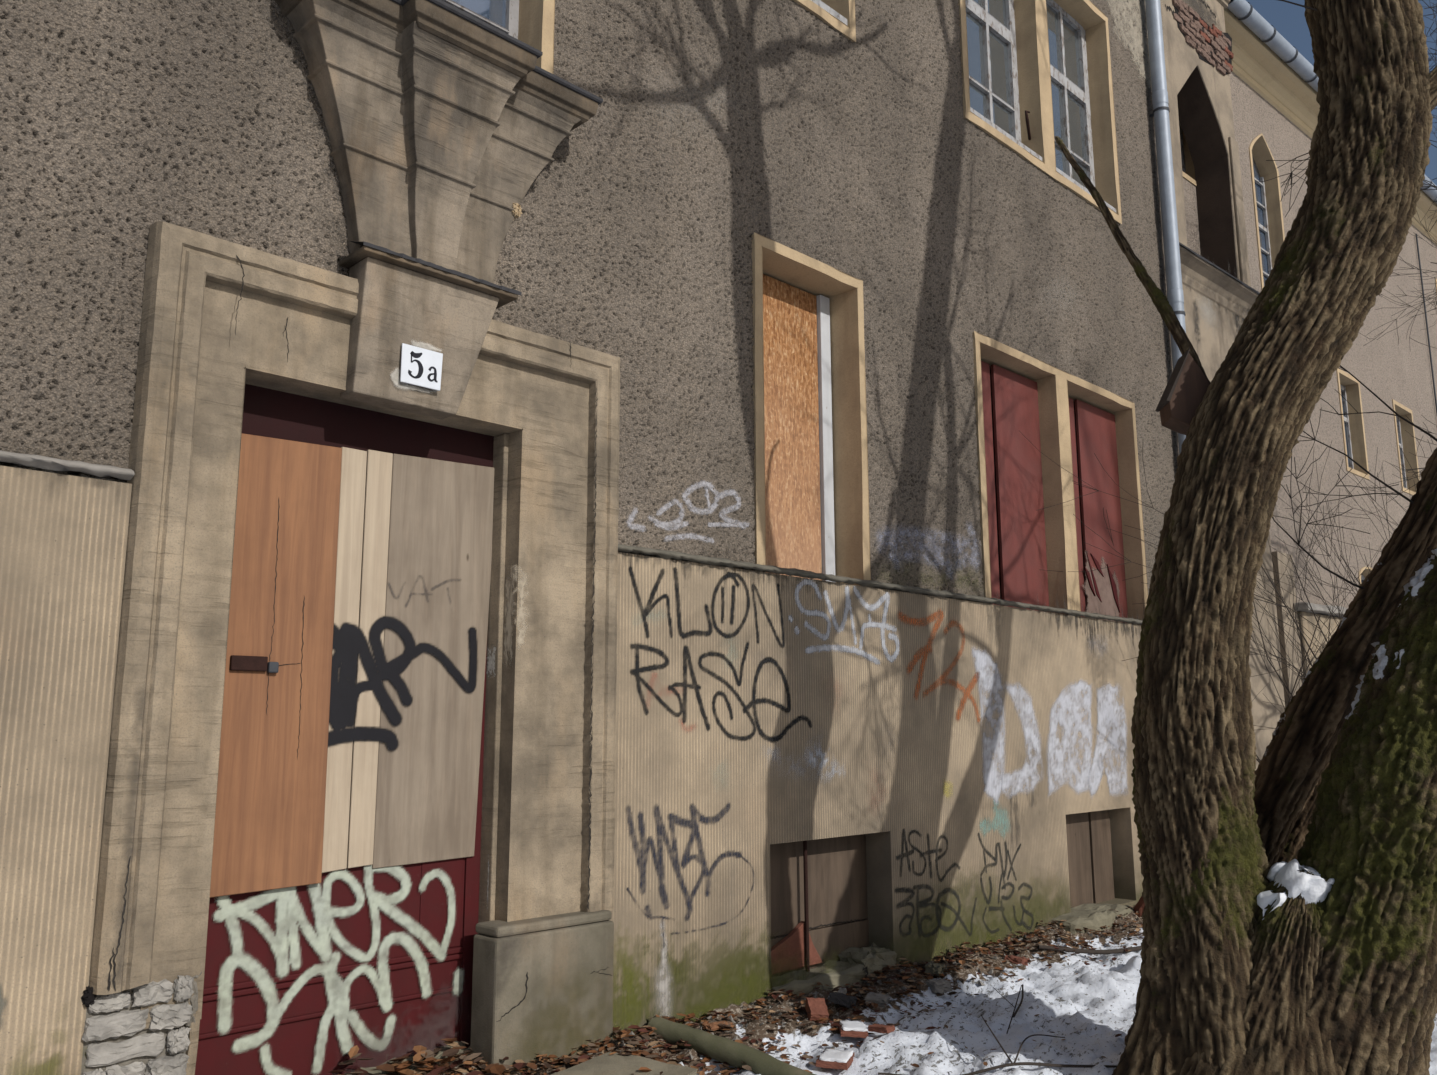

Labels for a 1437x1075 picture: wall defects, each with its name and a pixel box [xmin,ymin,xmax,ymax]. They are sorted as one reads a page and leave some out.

peeling [1109,0,1152,92]
spalling [1172,0,1234,76]
damp [613,926,799,1034]